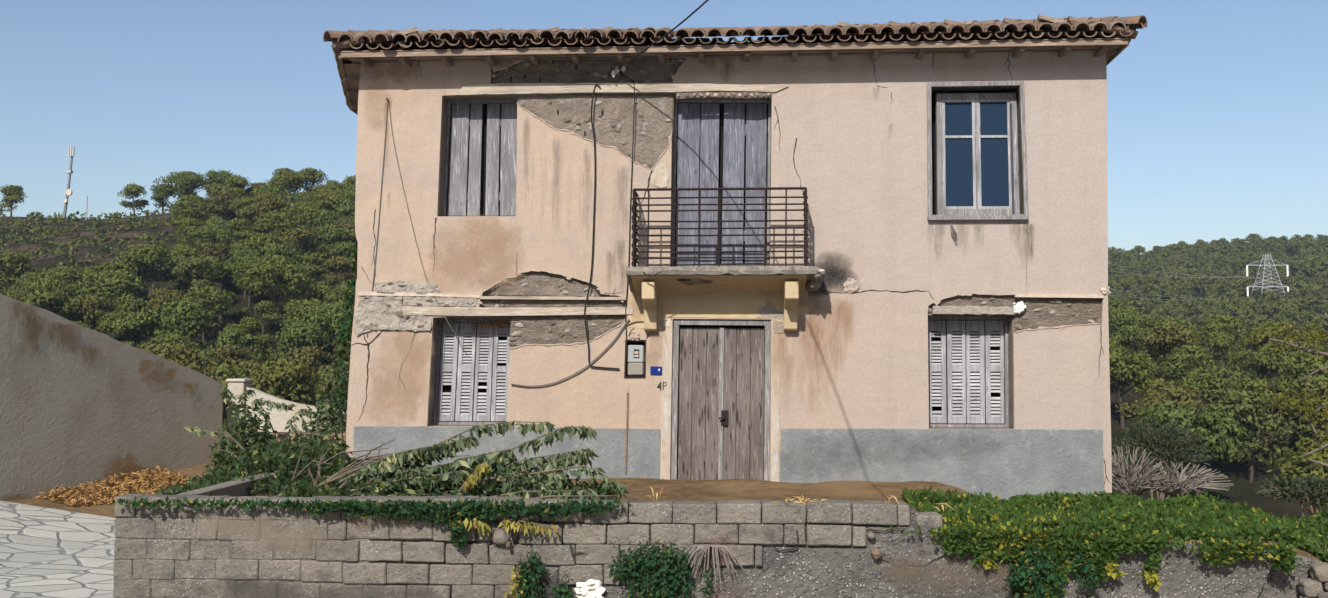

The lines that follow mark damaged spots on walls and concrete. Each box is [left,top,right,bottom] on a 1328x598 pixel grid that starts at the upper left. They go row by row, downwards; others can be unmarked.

flaking render [491,52,772,188]
flaking render [354,270,626,349]
crack [821,289,935,301]
flaking render [928,293,1102,333]
crack [350,330,416,422]